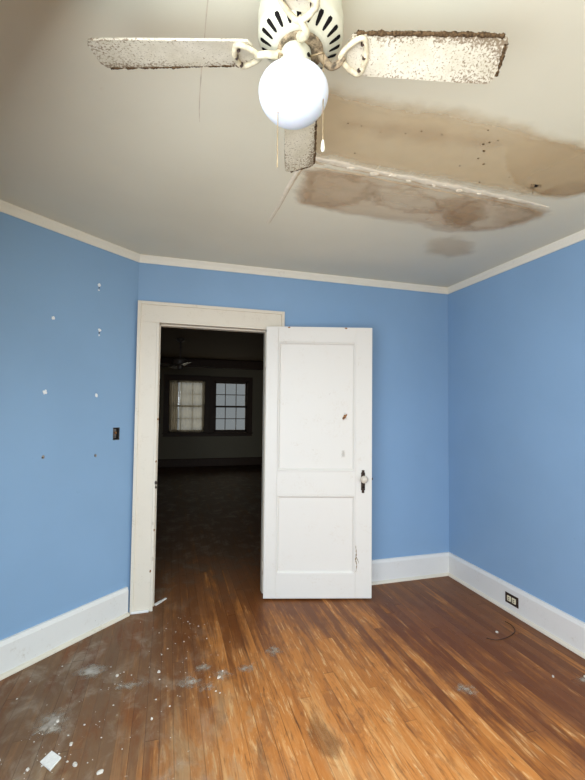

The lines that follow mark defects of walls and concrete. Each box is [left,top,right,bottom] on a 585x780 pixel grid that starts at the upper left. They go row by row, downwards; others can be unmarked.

damp [291,95,585,214]